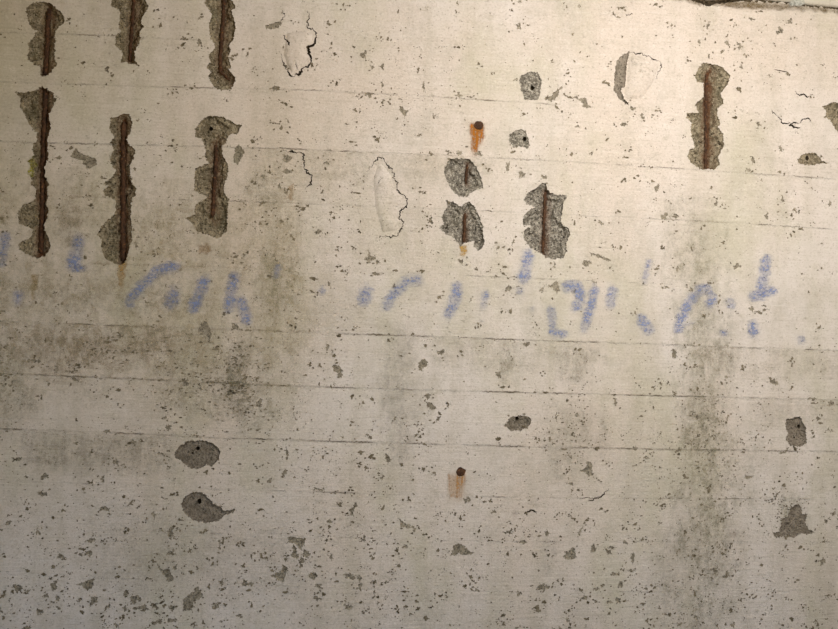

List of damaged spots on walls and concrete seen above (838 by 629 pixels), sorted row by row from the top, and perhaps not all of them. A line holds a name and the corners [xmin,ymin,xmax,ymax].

crack [281,10,317,77]
spalling [0,0,398,340]
crack [366,157,408,238]
corrosion [470,121,484,152]
spalling [412,51,628,304]
peeling [602,51,662,136]
spalling [682,0,763,172]
spalling [822,102,838,131]
corrosion [448,467,466,497]